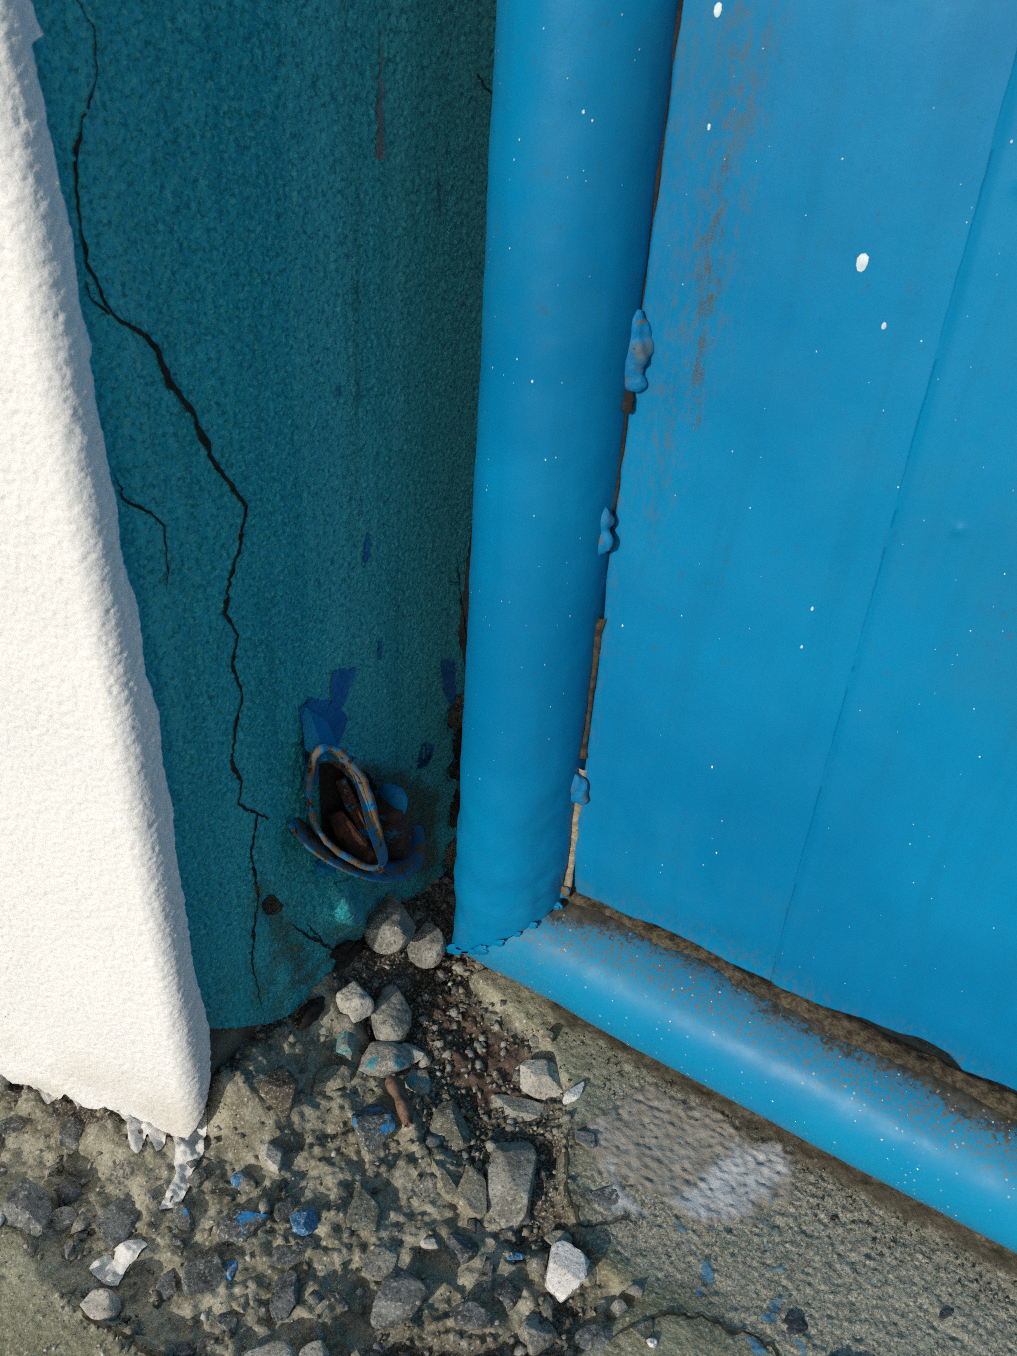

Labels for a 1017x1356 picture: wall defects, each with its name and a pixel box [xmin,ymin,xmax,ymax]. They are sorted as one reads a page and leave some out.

crack [73,0,269,1024]
spalling [444,693,464,898]
spalling [262,895,284,915]
crack [289,923,334,950]
spalling [330,939,364,972]
spalling [295,996,325,1030]
crack [611,1309,779,1356]